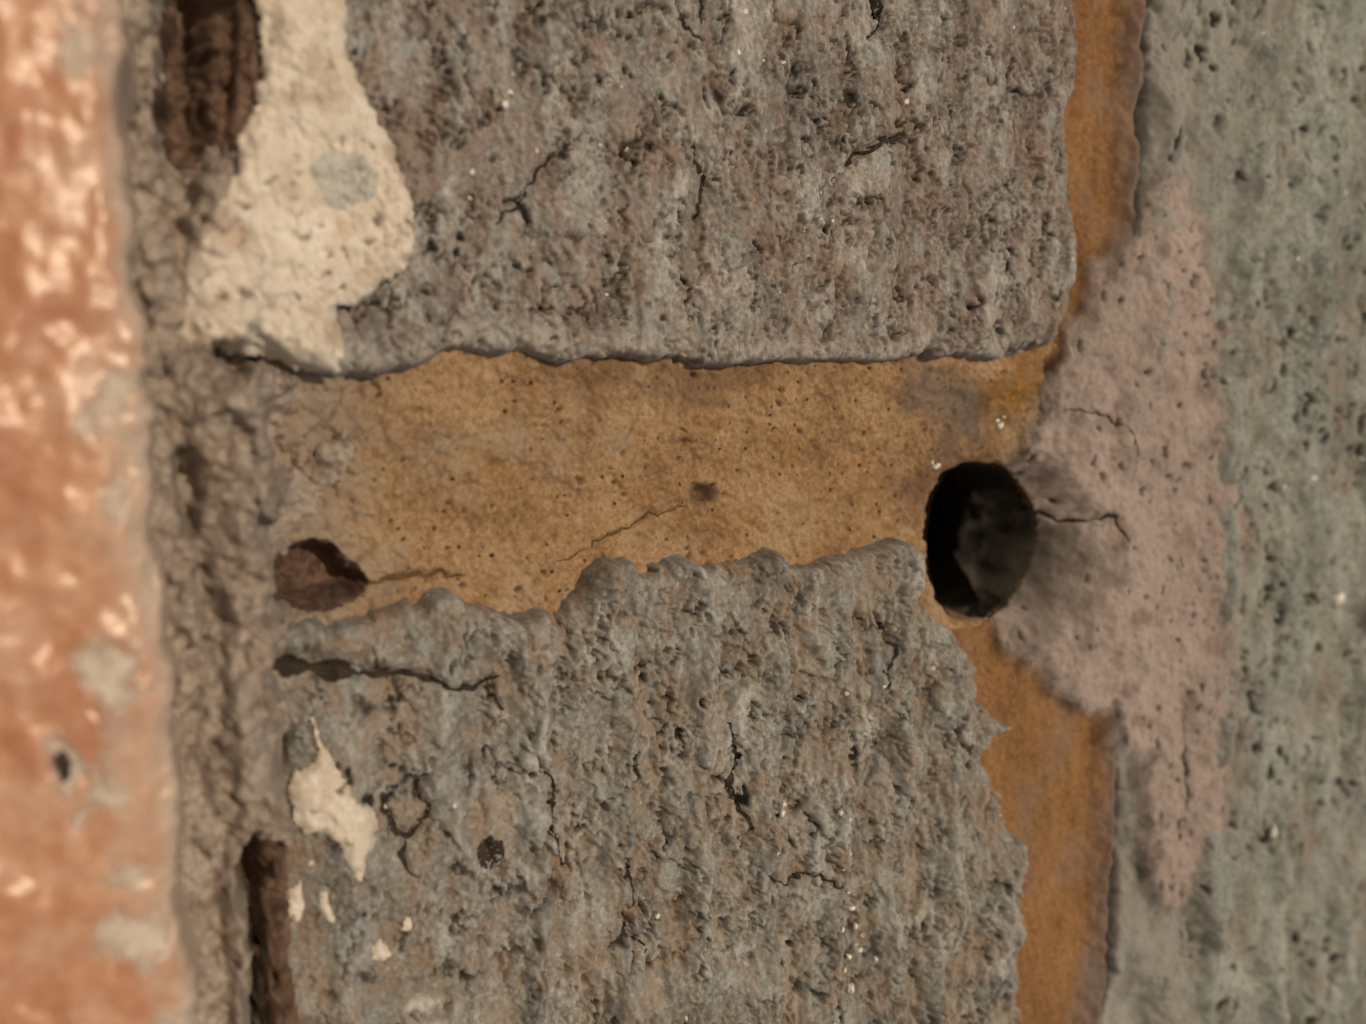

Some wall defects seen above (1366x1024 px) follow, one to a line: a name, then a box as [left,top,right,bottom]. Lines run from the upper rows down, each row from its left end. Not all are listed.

spalling [210,365,369,634]
crack [982,505,1130,543]
crack [1065,408,1139,480]
spalling [242,666,288,832]